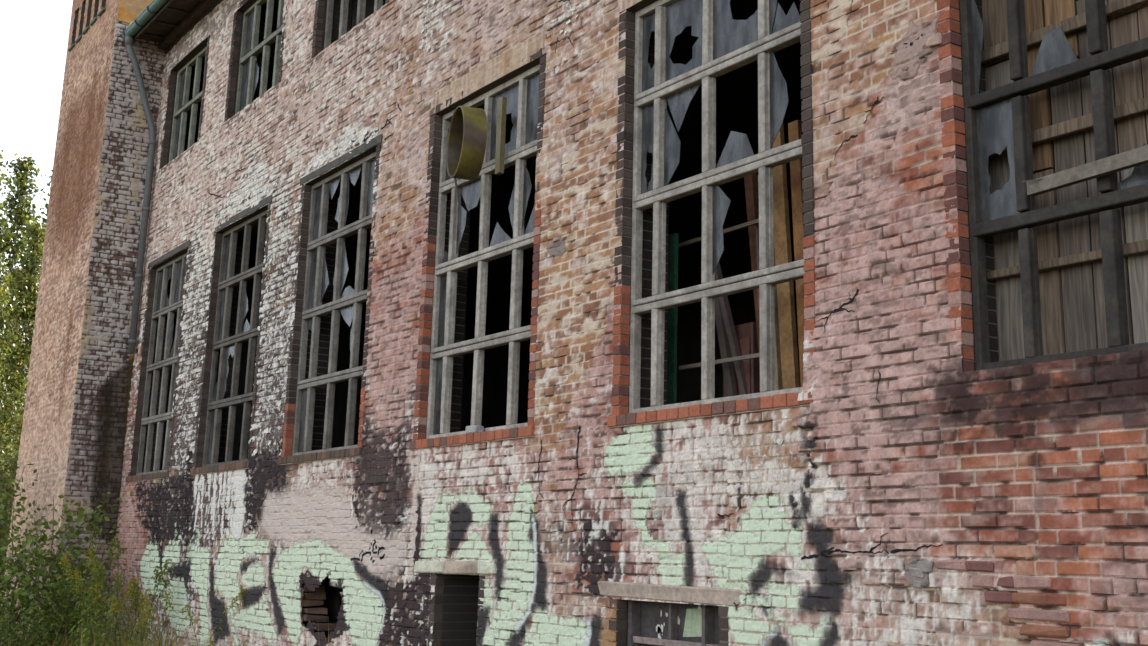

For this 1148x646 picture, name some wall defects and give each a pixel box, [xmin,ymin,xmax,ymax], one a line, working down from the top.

peeling [260,449,421,588]
spalling [297,569,350,646]